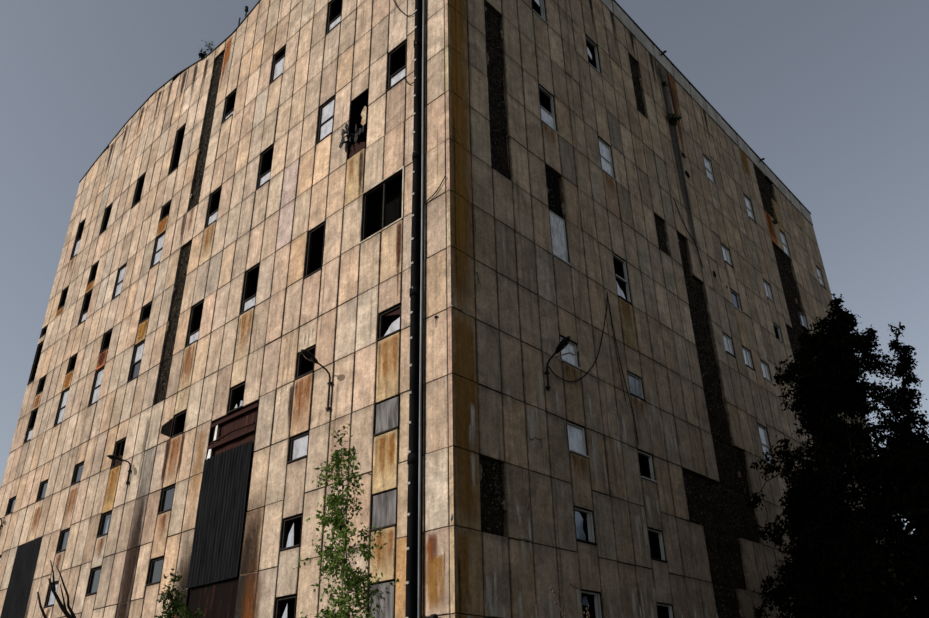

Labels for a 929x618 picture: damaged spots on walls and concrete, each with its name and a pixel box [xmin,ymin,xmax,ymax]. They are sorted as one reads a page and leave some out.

corrosion [451,0,471,292]
peeling [484,4,510,180]
peeling [772,244,814,380]
corrosion [161,435,184,480]
corrosion [288,377,310,435]
corrosion [455,323,477,511]
peeling [479,458,507,536]
peeling [654,216,760,618]
corrosion [427,535,443,604]